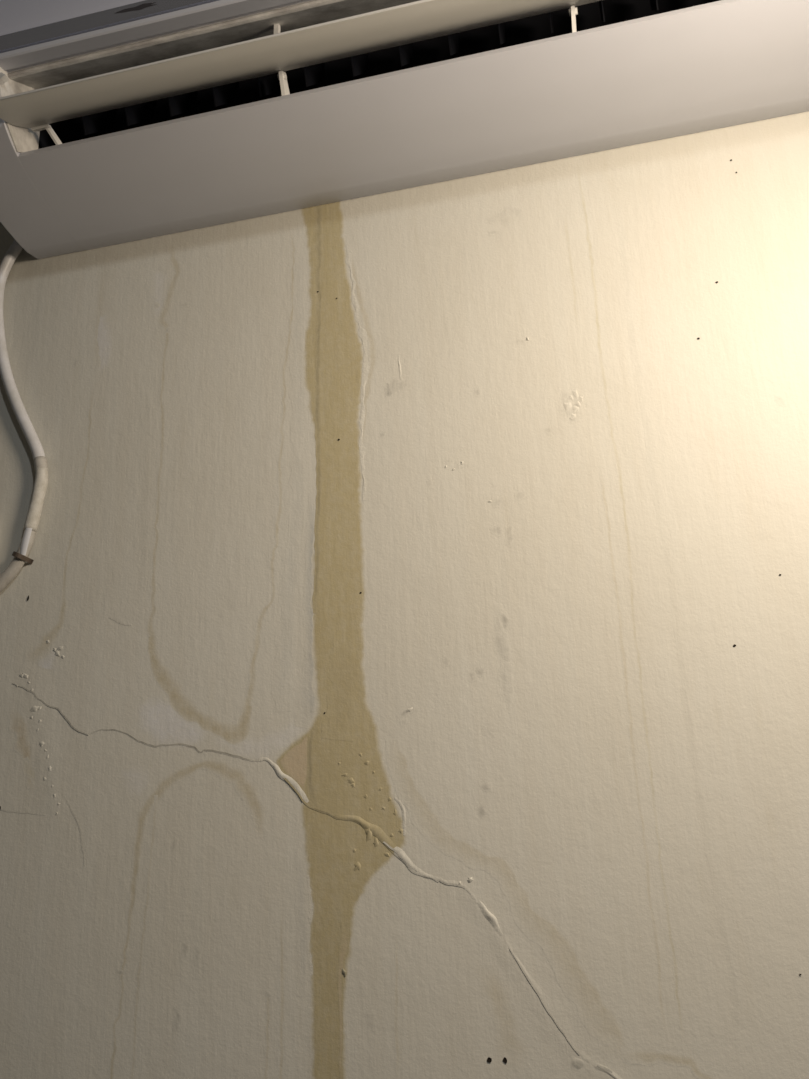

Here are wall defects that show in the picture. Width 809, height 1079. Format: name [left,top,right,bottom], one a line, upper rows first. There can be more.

crack [12,683,623,1079]
water stain [110,162,715,1079]